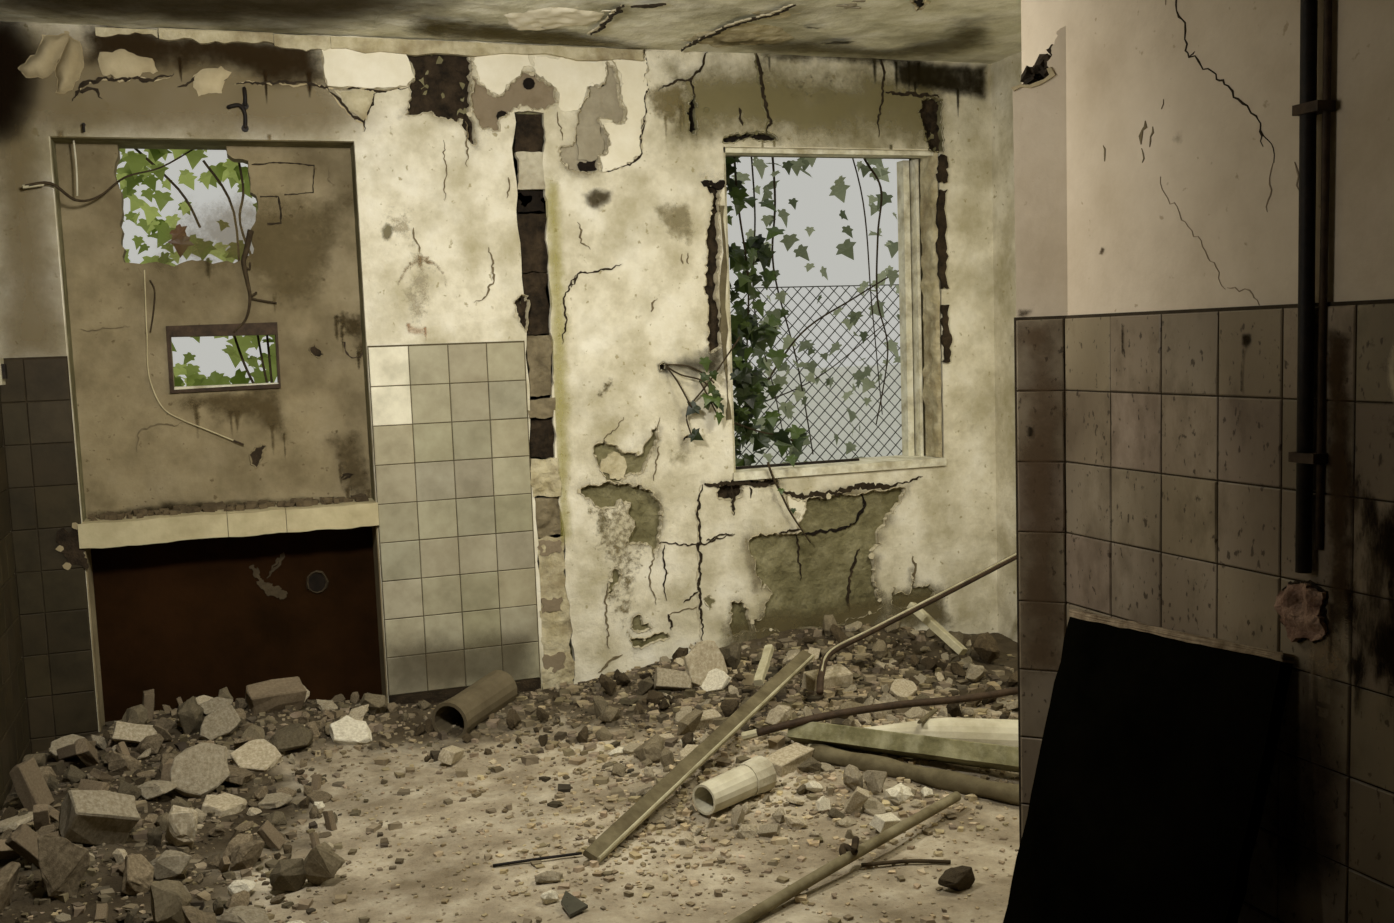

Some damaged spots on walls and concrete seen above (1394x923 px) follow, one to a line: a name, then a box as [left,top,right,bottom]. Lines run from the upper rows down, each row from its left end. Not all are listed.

crack [588,3,666,35]
crack [601,4,796,173]
crack [1165,0,1299,212]
crack [562,222,621,344]
crack [1160,177,1259,304]
flaking render [321,50,664,689]
flaking render [629,614,671,650]
flaking render [703,478,935,637]
spalling [1274,580,1329,644]
damp [1326,333,1394,712]